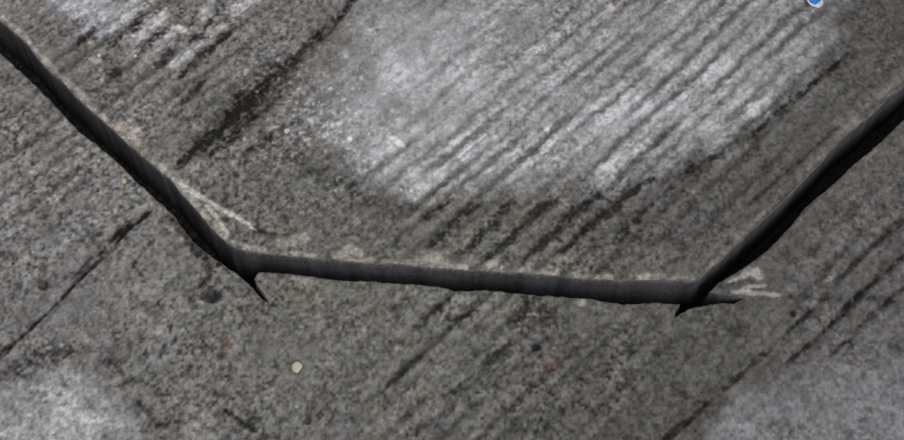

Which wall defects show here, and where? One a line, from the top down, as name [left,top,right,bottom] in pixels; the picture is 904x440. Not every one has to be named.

crack [177,0,356,168]
crack [751,54,846,137]
crack [684,155,717,174]
crack [0,212,150,357]
crack [787,254,904,363]
crack [663,352,765,440]